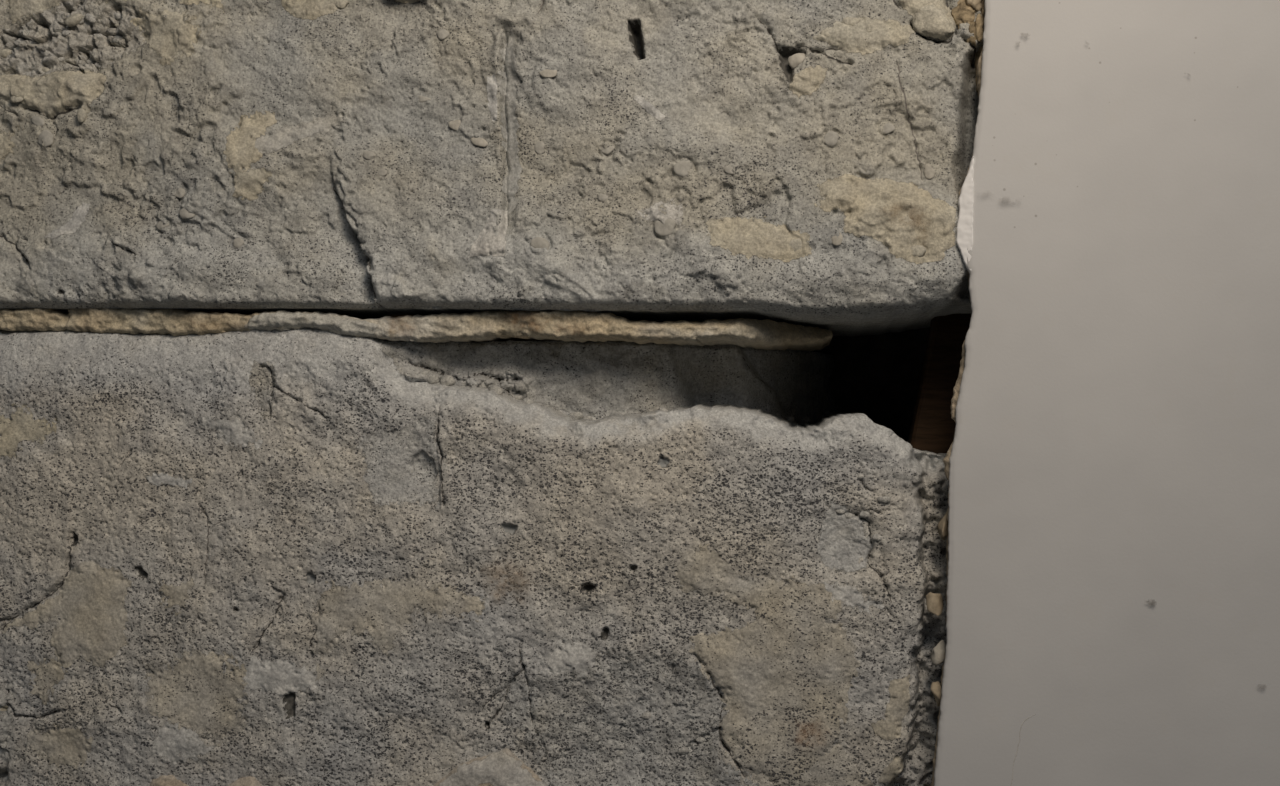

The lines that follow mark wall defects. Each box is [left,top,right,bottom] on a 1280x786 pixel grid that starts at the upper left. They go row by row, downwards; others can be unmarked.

spalling [382,341,832,426]
crack [0,533,76,629]